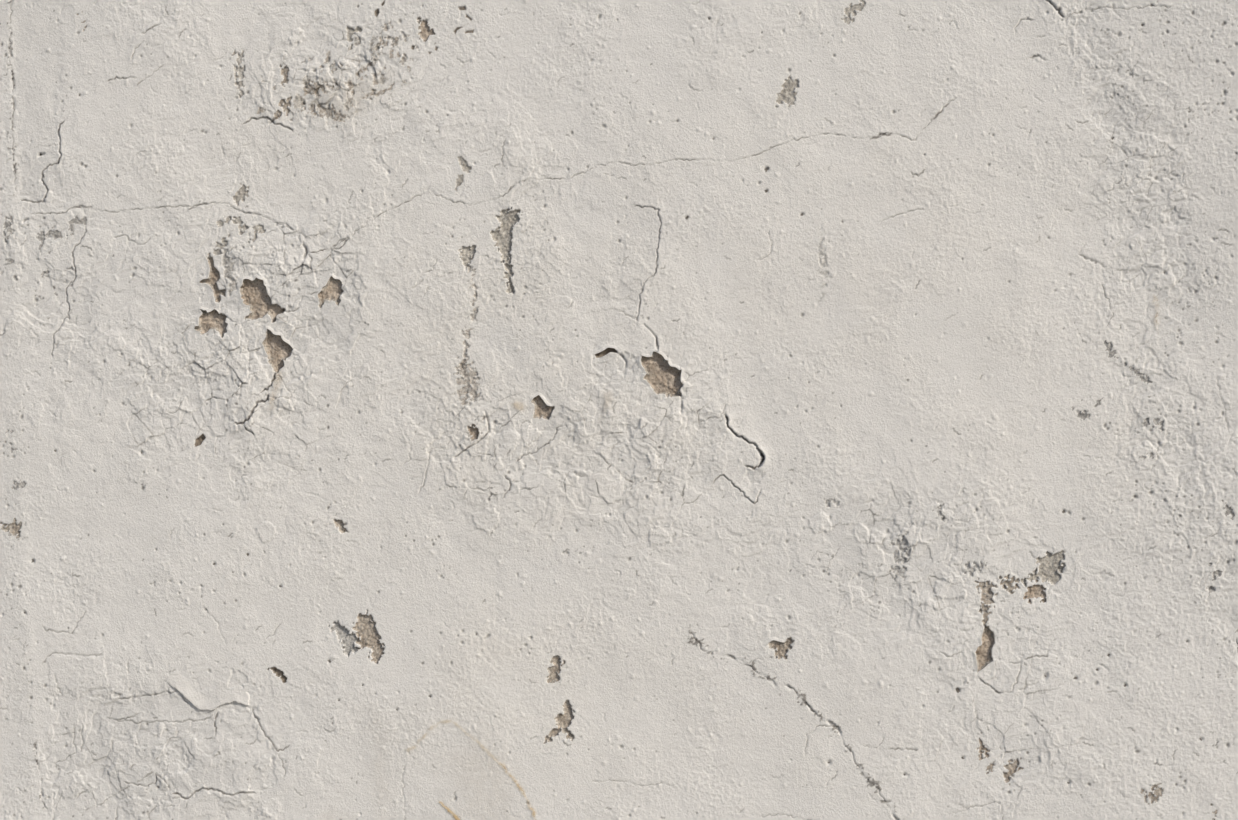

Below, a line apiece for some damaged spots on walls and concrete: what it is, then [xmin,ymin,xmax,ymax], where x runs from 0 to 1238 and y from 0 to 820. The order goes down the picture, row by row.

spalling [412,18,437,54]
peeling [274,65,292,119]
spalling [490,208,520,293]
spalling [192,183,294,373]
spalling [315,273,344,308]
spalling [638,330,685,397]
spalling [528,392,554,419]
spalling [331,611,385,663]
spalling [547,656,565,683]
spalling [764,637,794,659]
spalling [972,551,1065,672]
spalling [545,700,574,743]